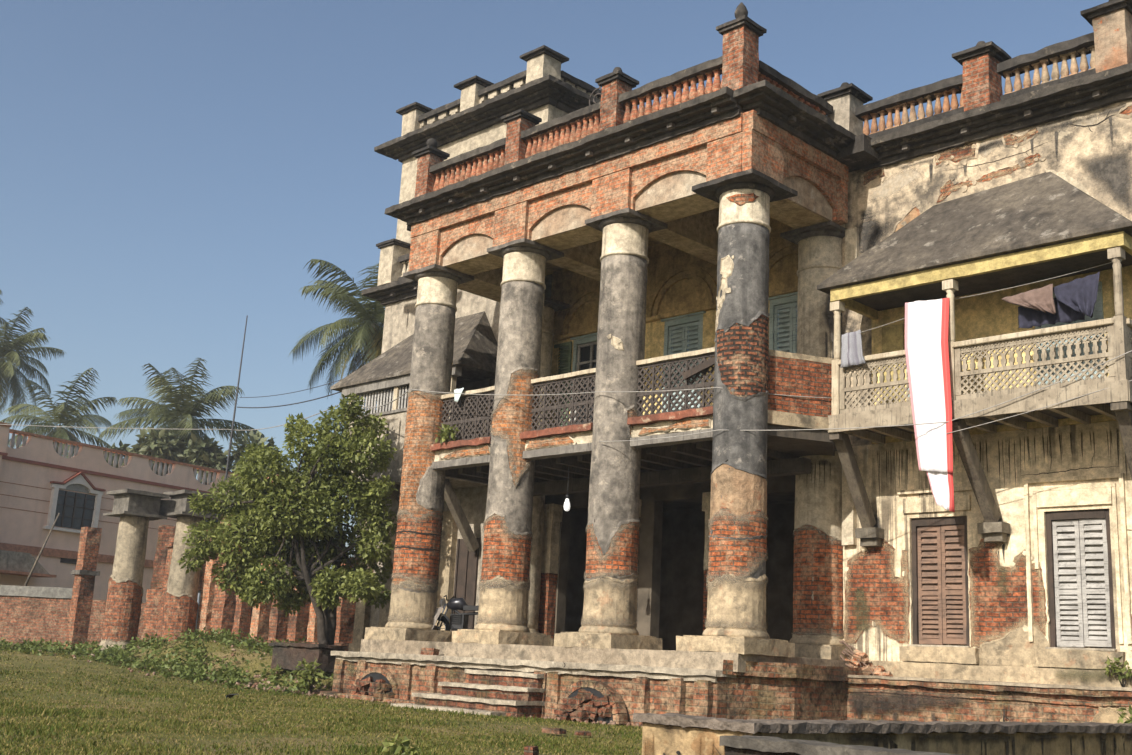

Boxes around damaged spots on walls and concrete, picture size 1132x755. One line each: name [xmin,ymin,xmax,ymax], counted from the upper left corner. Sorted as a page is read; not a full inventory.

leakage [859,211,896,255]
leakage [872,159,937,197]
leakage [978,139,1003,156]
leakage [1030,105,1132,210]
flaking render [714,255,770,402]
flaking render [101,575,143,644]
flaking render [388,367,576,638]
flaking render [581,519,641,629]
flaking render [703,458,768,632]
flaking render [791,522,912,646]
flaking render [967,538,1050,649]
leakage [974,429,1127,485]